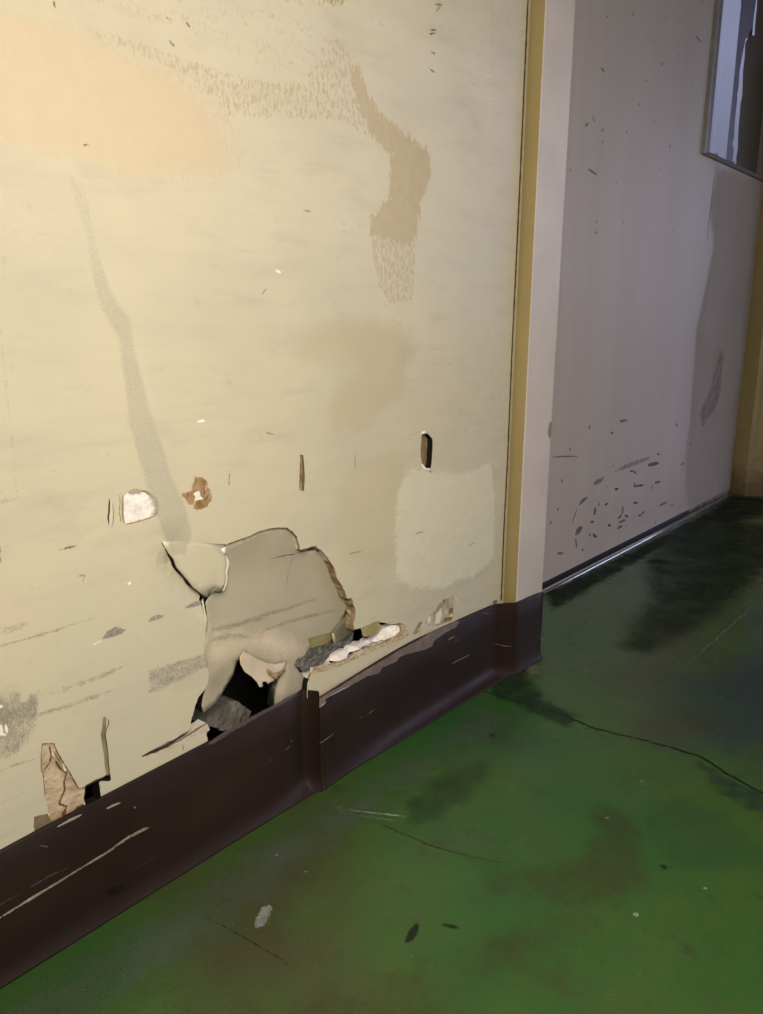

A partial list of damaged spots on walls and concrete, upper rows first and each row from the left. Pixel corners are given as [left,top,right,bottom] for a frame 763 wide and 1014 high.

flaking render [107,488,159,527]
peeling [182,476,212,510]
spalling [412,595,458,634]
spalling [341,628,372,655]
spalling [222,653,273,723]
spalling [207,726,226,741]
crack [485,670,763,815]
spalling [84,773,109,805]